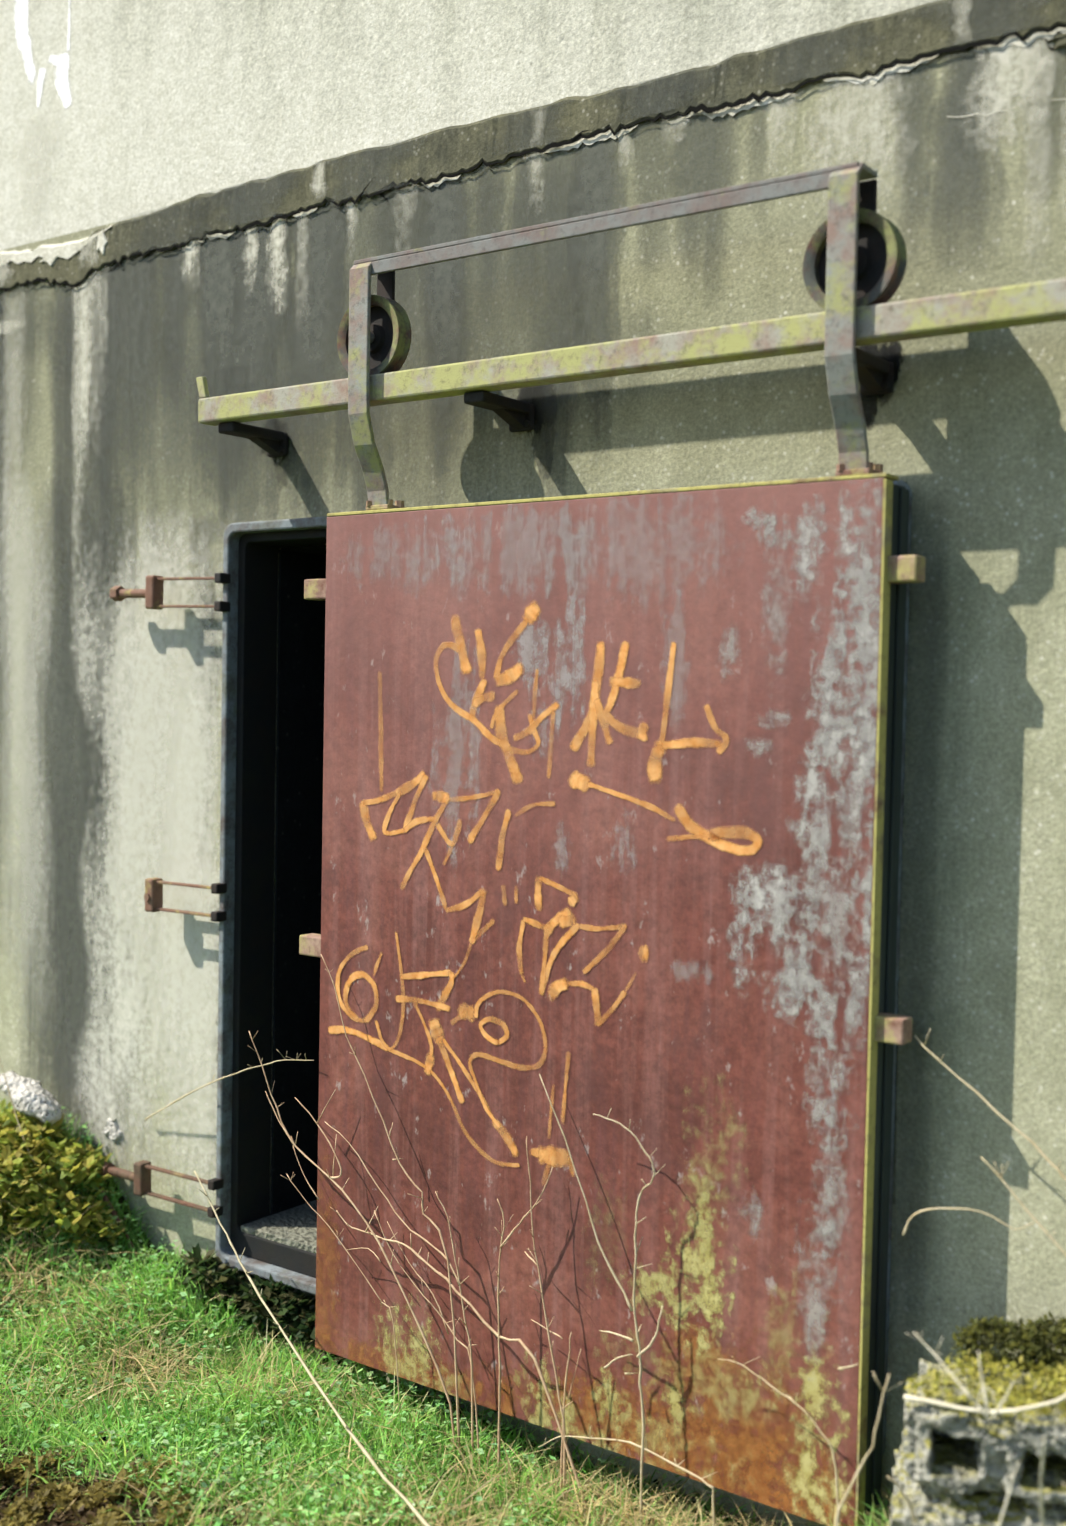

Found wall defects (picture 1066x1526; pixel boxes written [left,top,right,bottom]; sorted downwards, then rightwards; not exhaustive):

crack [0,24,1066,292]
damp [517,128,625,227]
damp [823,0,1045,229]
damp [545,229,617,347]
damp [0,304,17,769]
damp [27,165,502,1202]
peeling [729,499,881,1138]
corrosion [349,1343,482,1404]
corrosion [501,1400,513,1416]
corrosion [563,1328,855,1525]
peeling [808,1290,825,1331]